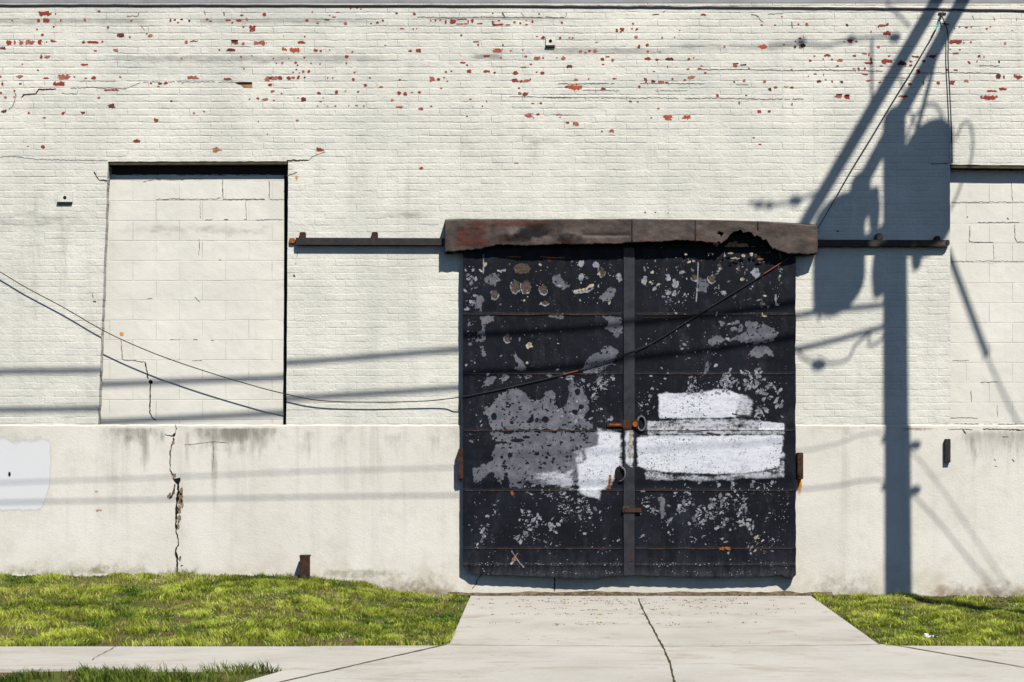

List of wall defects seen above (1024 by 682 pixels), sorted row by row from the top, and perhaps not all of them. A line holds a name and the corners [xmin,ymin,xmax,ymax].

peeling [0,11,96,90]
peeling [218,12,330,101]
peeling [297,51,383,107]
peeling [430,13,589,118]
peeling [616,23,706,88]
peeling [783,23,969,99]
peeling [980,60,1023,100]
peeling [474,260,622,357]
peeling [691,275,727,296]
peeling [708,320,779,358]
peeling [473,316,623,489]
crack [121,340,226,571]